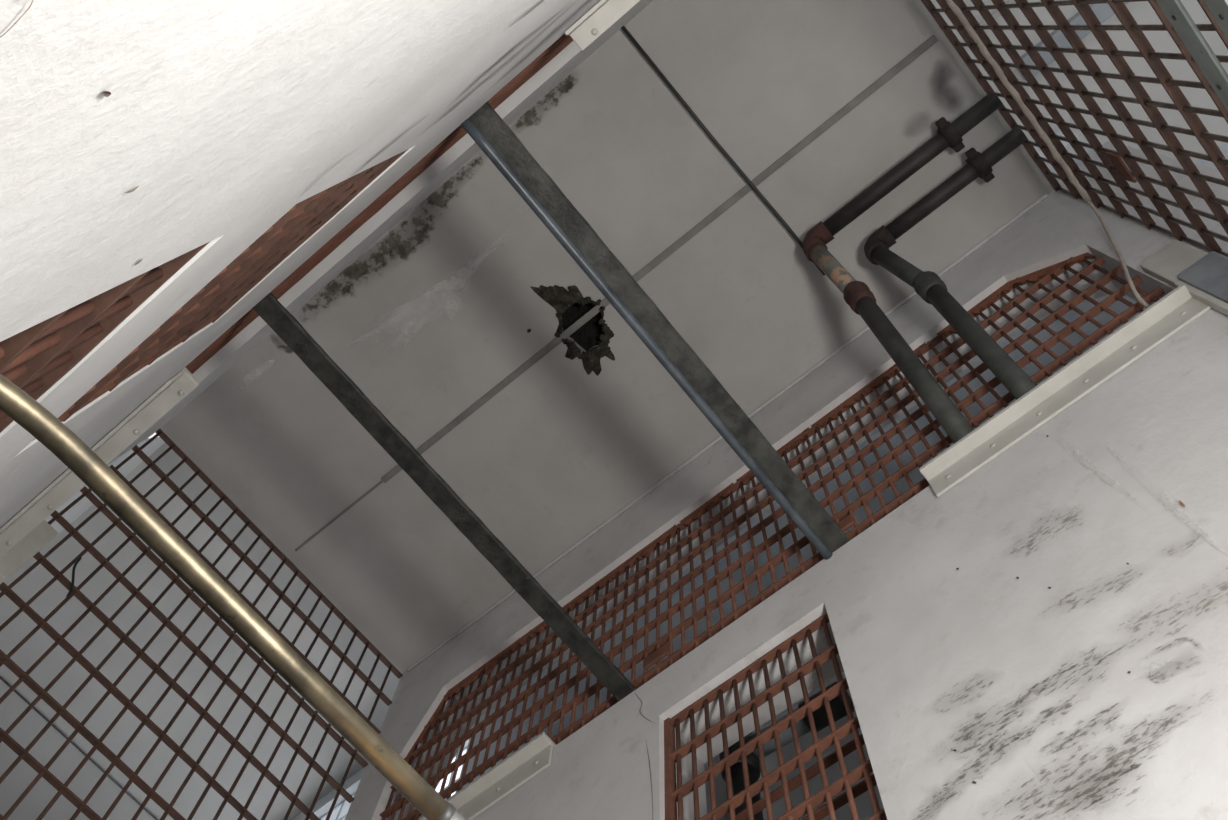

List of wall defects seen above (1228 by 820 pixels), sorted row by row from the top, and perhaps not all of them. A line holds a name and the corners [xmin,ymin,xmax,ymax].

leakage [442,0,590,118]
leakage [516,75,576,128]
leakage [303,157,481,312]
peeling [554,286,614,366]
leakage [1134,583,1228,683]
leakage [918,646,1124,820]
leakage [1005,703,1190,820]